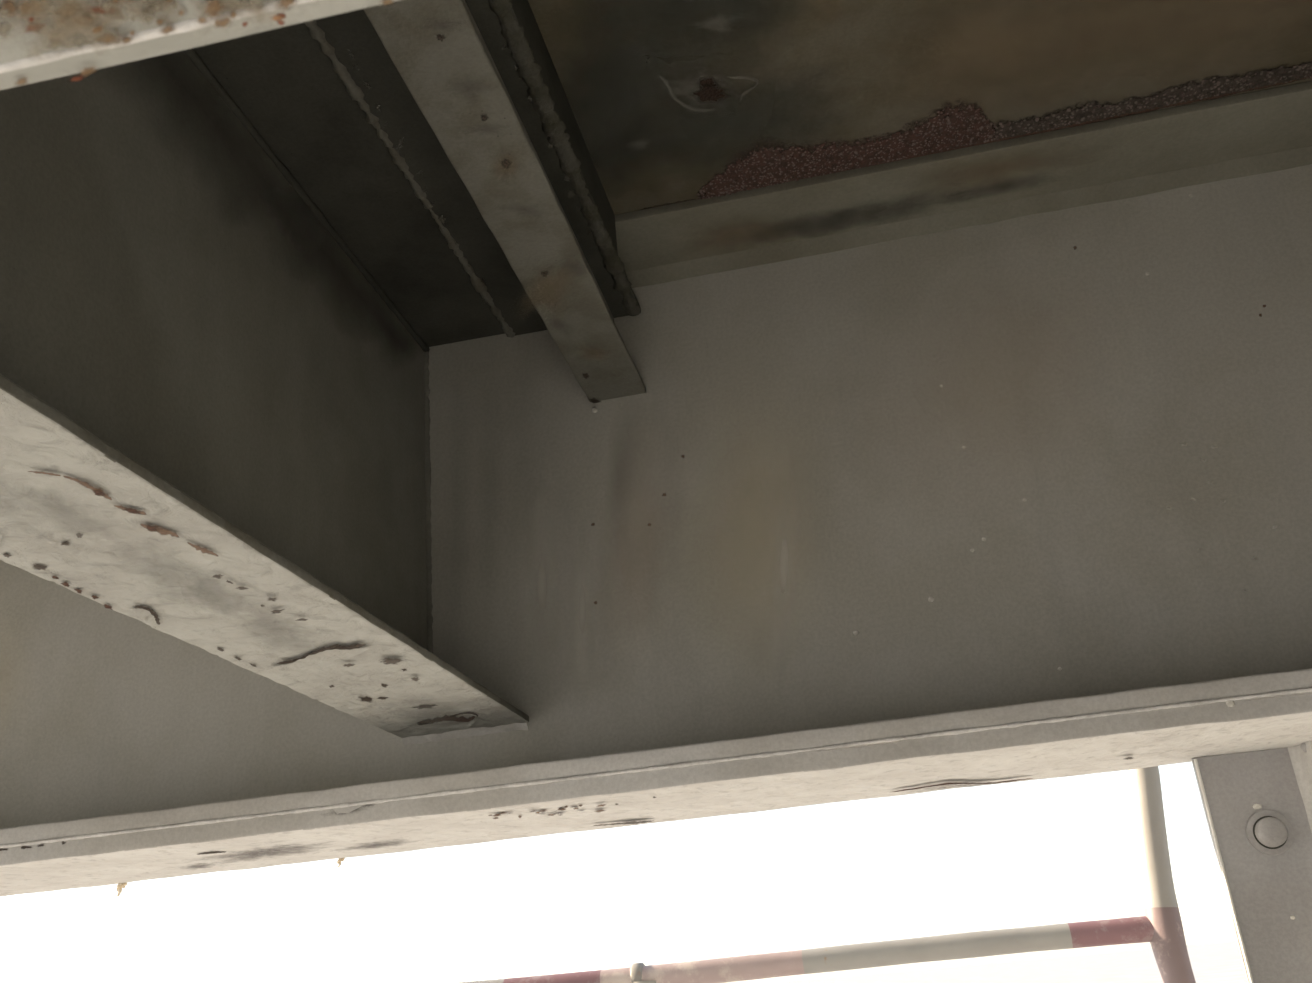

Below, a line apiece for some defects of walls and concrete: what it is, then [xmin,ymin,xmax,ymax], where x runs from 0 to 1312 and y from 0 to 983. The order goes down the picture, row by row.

rust [0,0,295,50]
spalling [34,564,112,610]
peeling [132,605,160,629]
peeling [273,644,369,671]
peeling [380,658,419,681]